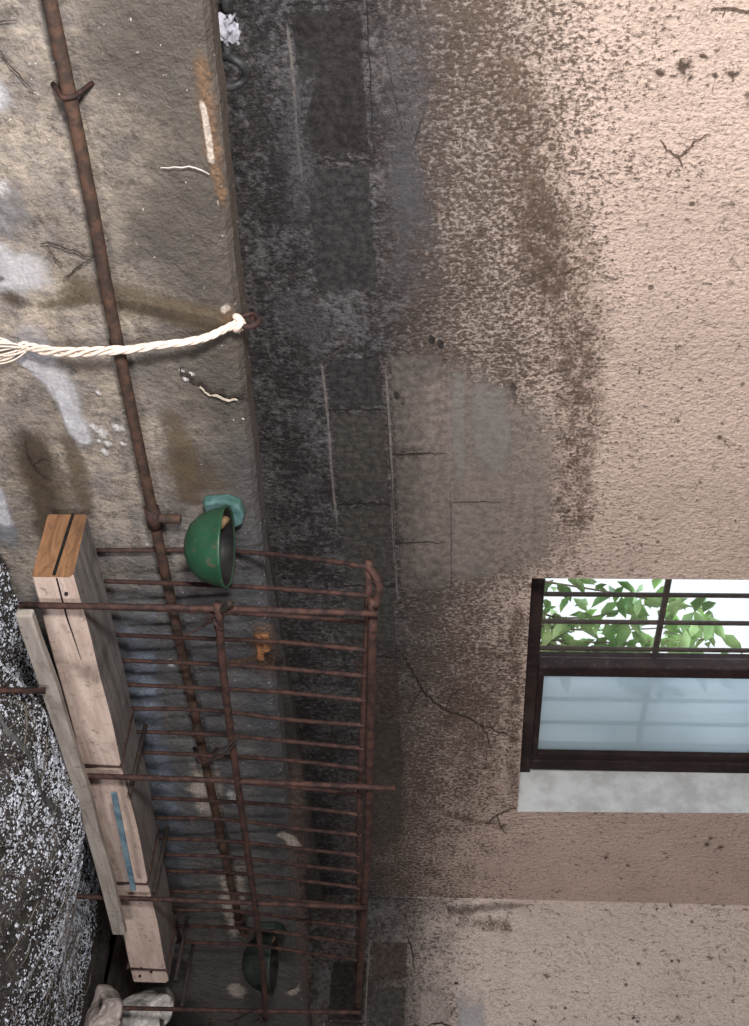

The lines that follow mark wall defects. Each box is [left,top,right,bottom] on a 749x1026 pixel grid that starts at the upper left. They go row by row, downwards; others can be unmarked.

crack [711,7,749,16]
crack [0,50,34,92]
rust [194,56,226,203]
crack [660,134,711,168]
crack [41,242,93,280]
leakage [492,52,603,540]
crack [402,653,509,749]
leakage [442,608,524,793]
leakage [447,904,516,931]